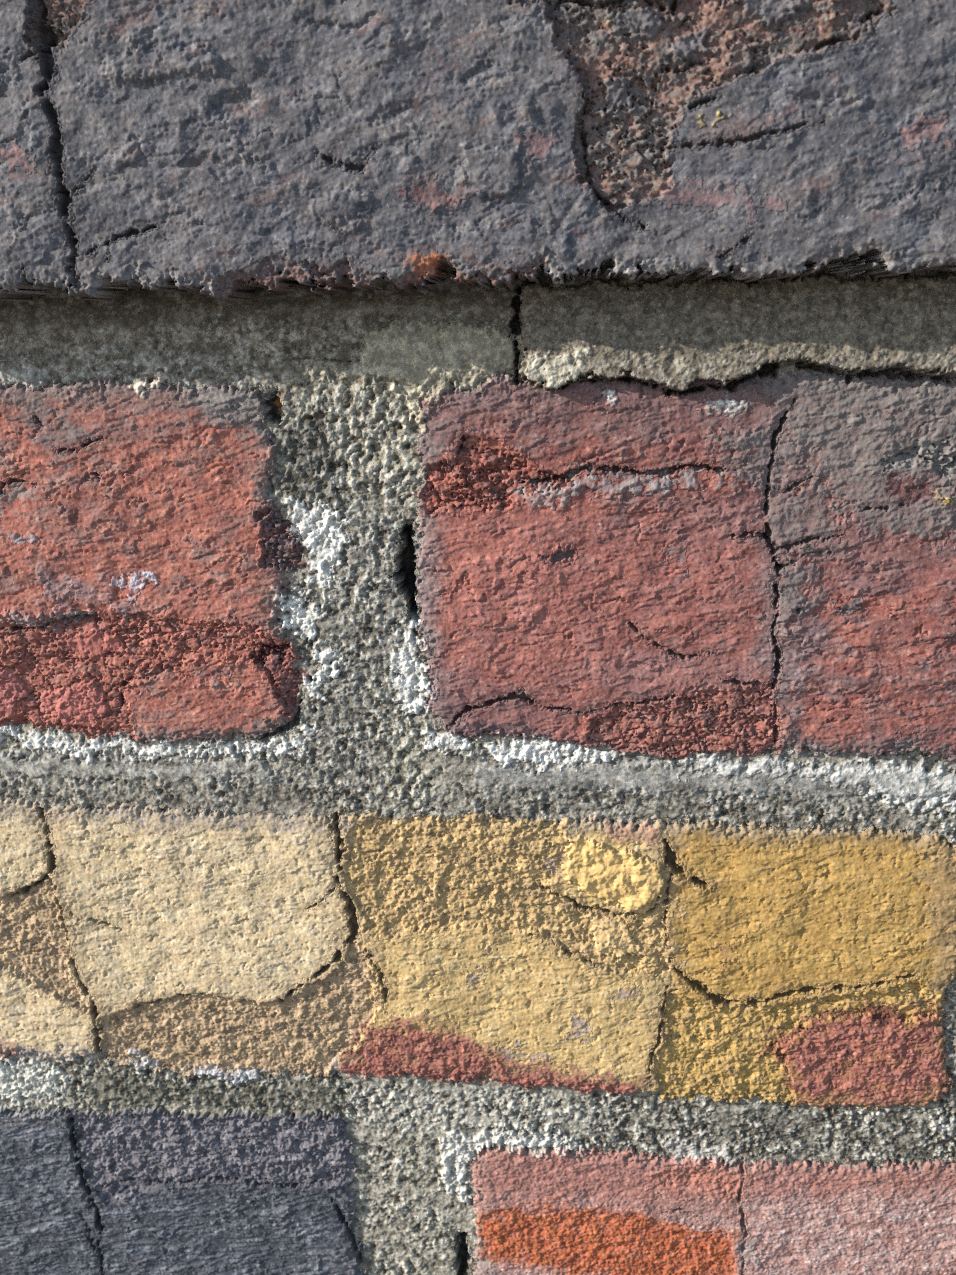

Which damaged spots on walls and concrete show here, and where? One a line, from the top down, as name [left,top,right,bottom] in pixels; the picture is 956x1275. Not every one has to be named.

spalling [19,0,97,54]
crack [18,0,159,292]
spalling [499,0,900,214]
water stain [7,531,41,551]
crack [31,414,107,479]
water stain [109,570,159,628]
water stain [0,272,591,433]
water stain [267,397,356,702]
spalling [412,427,578,526]
crack [444,272,956,749]
crack [0,805,390,1055]
crack [528,837,917,1088]